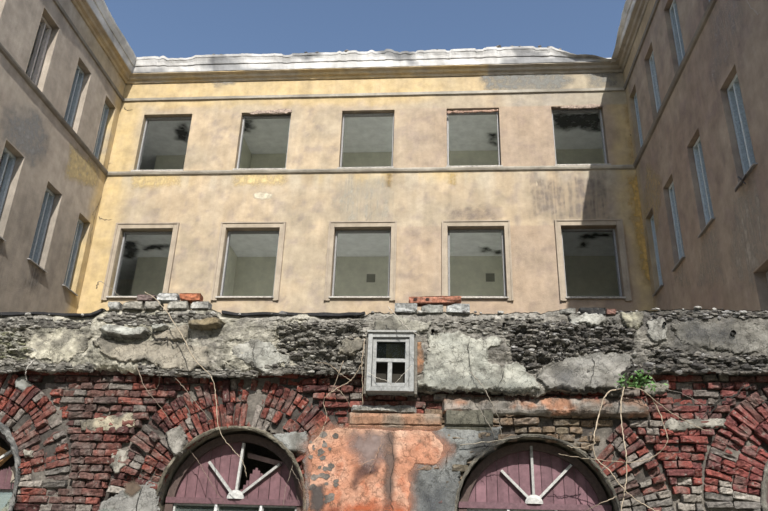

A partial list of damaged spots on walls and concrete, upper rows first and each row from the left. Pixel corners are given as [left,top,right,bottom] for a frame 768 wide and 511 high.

flaking render [0,310,768,393]
flaking render [273,426,502,511]